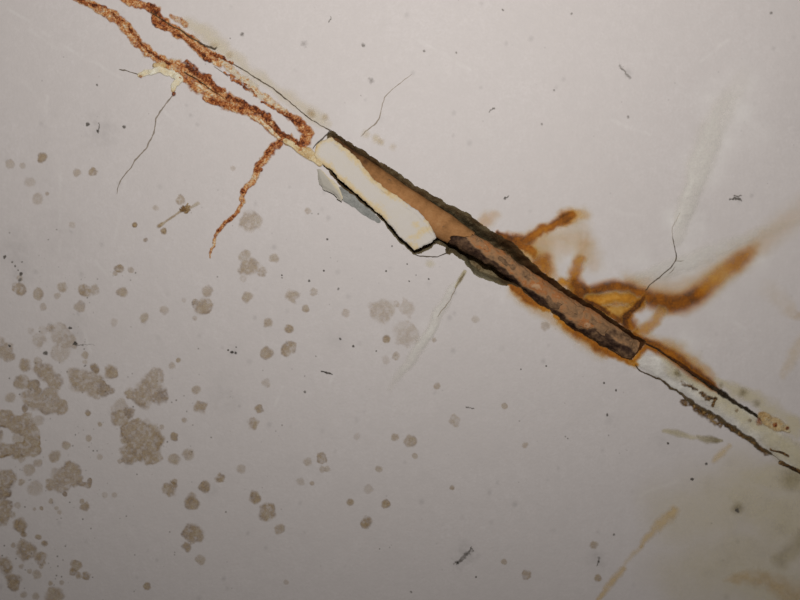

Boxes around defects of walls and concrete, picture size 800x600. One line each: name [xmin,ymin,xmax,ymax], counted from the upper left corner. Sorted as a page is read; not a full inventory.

crack [74,0,330,258]
corrosion [158,203,198,234]
spalling [314,130,646,360]
corrosion [496,210,583,283]
corrosion [509,251,751,392]
crack [646,237,677,290]
water stain [115,409,177,464]
crack [635,344,800,474]